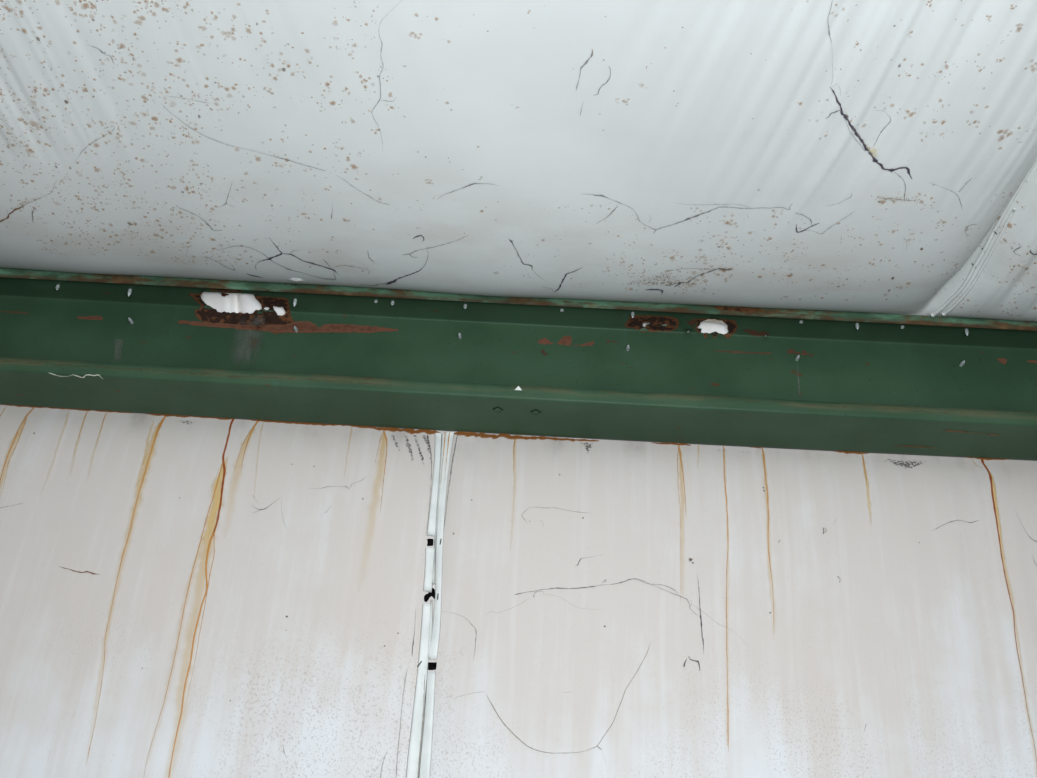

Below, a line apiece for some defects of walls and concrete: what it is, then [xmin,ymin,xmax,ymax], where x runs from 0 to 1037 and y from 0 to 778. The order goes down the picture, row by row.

crack [825,85,912,200]
crack [180,189,338,280]
rust [178,281,398,334]
crack [368,243,448,285]
crack [648,207,733,234]
crack [647,268,734,295]
rust [0,404,132,480]
rust [653,442,690,492]
rust [116,413,598,778]
crack [514,558,704,669]
rust [966,457,1024,687]